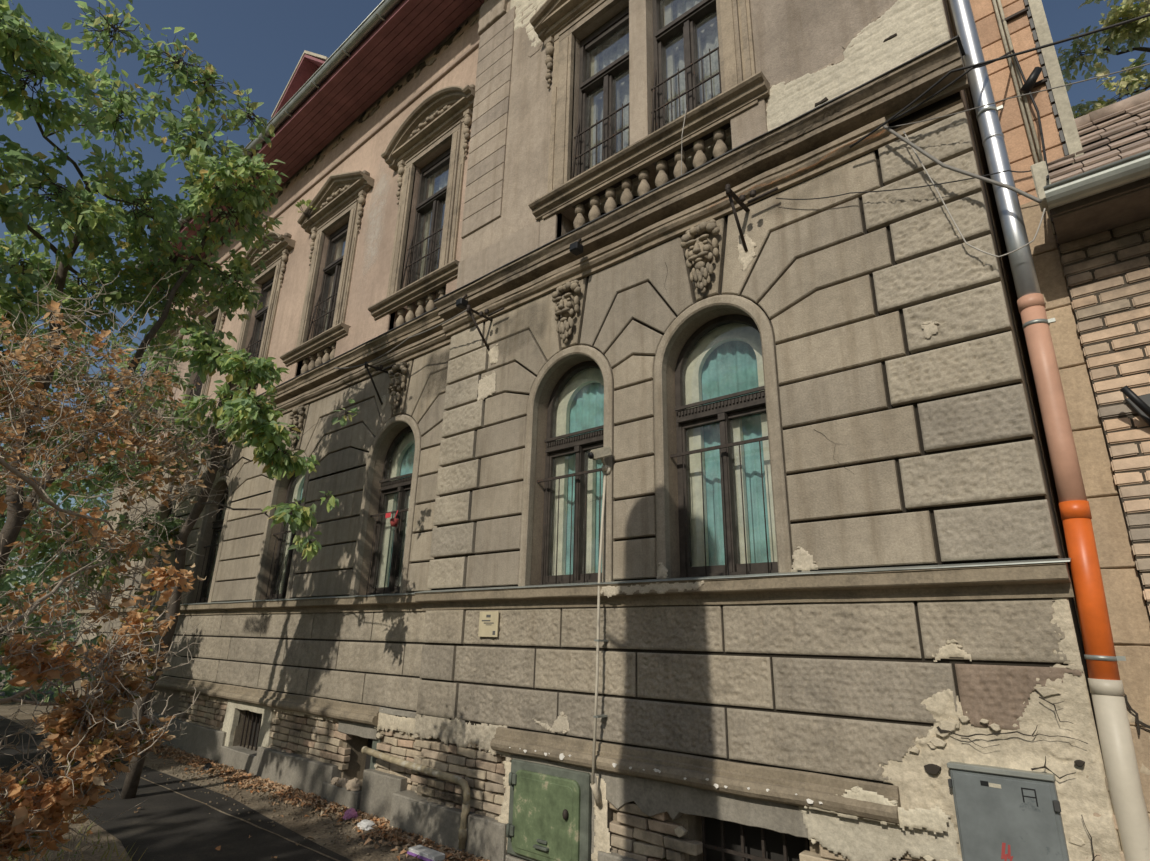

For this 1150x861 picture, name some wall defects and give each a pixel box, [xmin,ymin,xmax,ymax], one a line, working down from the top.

flaking render [510,0,546,57]
flaking render [766,0,950,131]
flaking render [374,709,512,824]
flaking render [799,598,1125,861]
crack [936,696,1088,779]
crack [1124,694,1150,735]
flaking render [591,776,703,861]